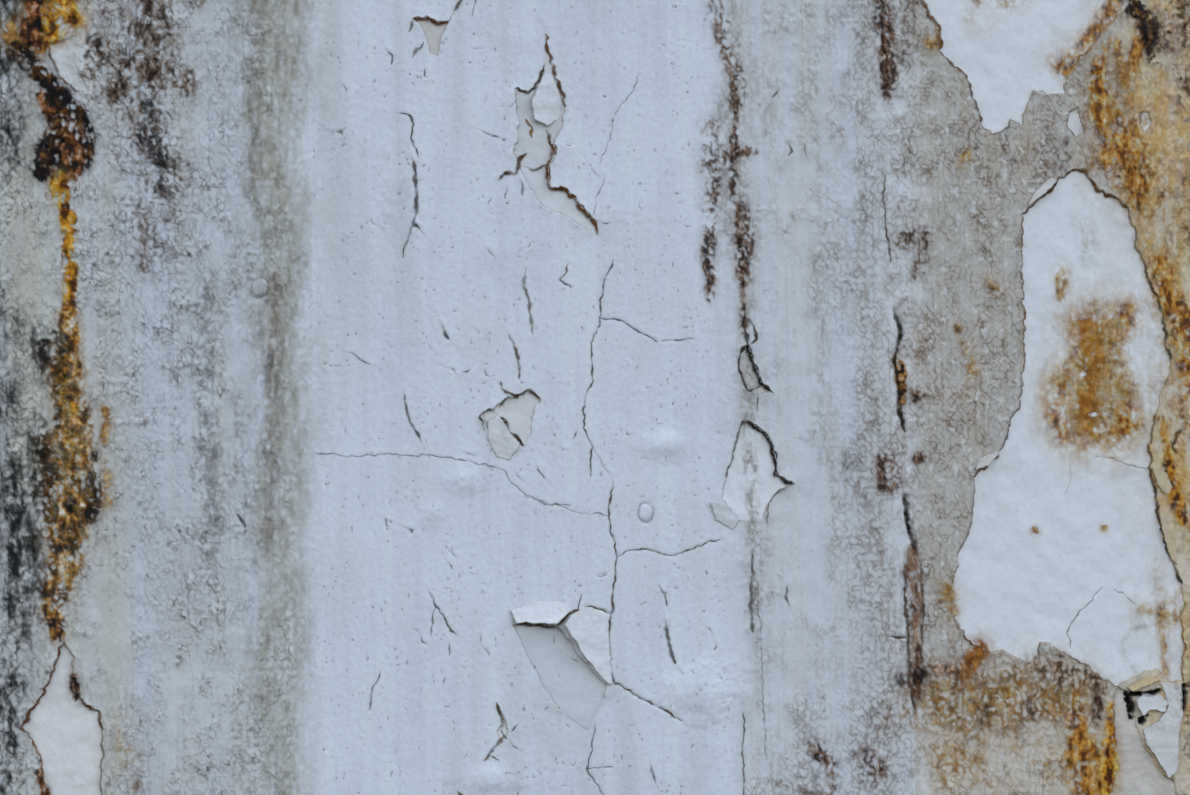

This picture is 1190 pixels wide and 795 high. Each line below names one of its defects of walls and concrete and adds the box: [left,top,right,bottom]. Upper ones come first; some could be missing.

leakage [0,0,29,177]
rust [1,0,113,642]
leakage [79,0,205,200]
crack [401,113,420,256]
peeling [921,0,1135,137]
rust [1044,0,1190,529]
leakage [0,386,49,795]
spalling [20,642,104,795]
crack [317,259,720,721]
crack [747,554,755,632]
rust [875,545,1120,795]
peeling [951,168,1187,795]